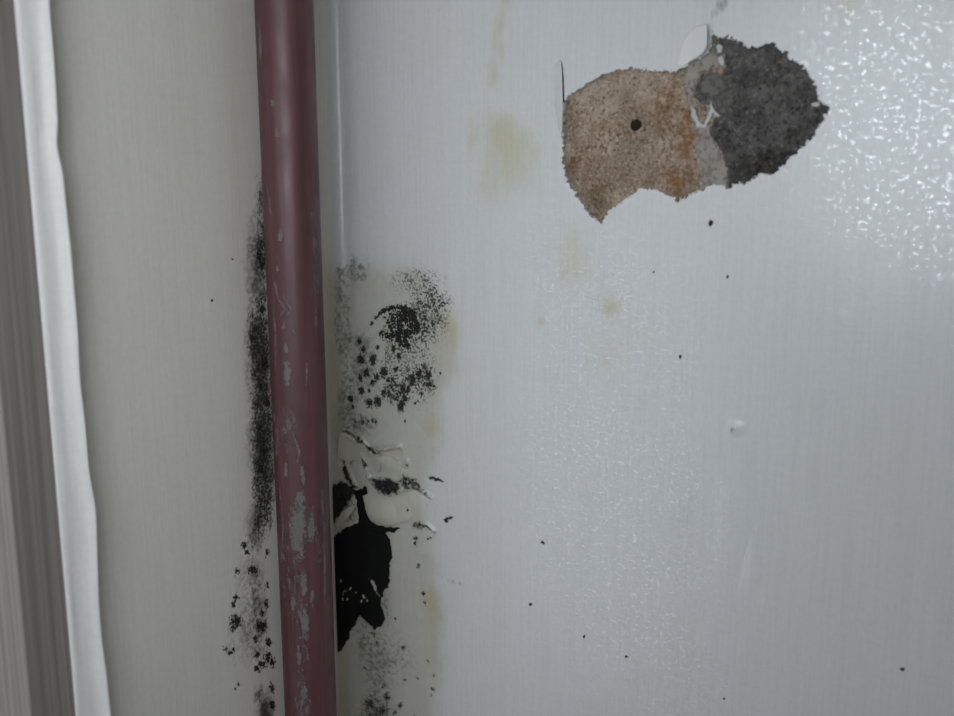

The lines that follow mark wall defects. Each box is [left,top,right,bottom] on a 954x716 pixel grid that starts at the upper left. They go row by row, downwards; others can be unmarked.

spalling [554,24,833,224]
water stain [347,275,445,424]
water stain [235,233,276,673]
water stain [343,426,381,467]
water stain [229,595,243,632]
water stain [332,462,444,652]
water stain [259,682,275,716]
water stain [364,685,402,716]